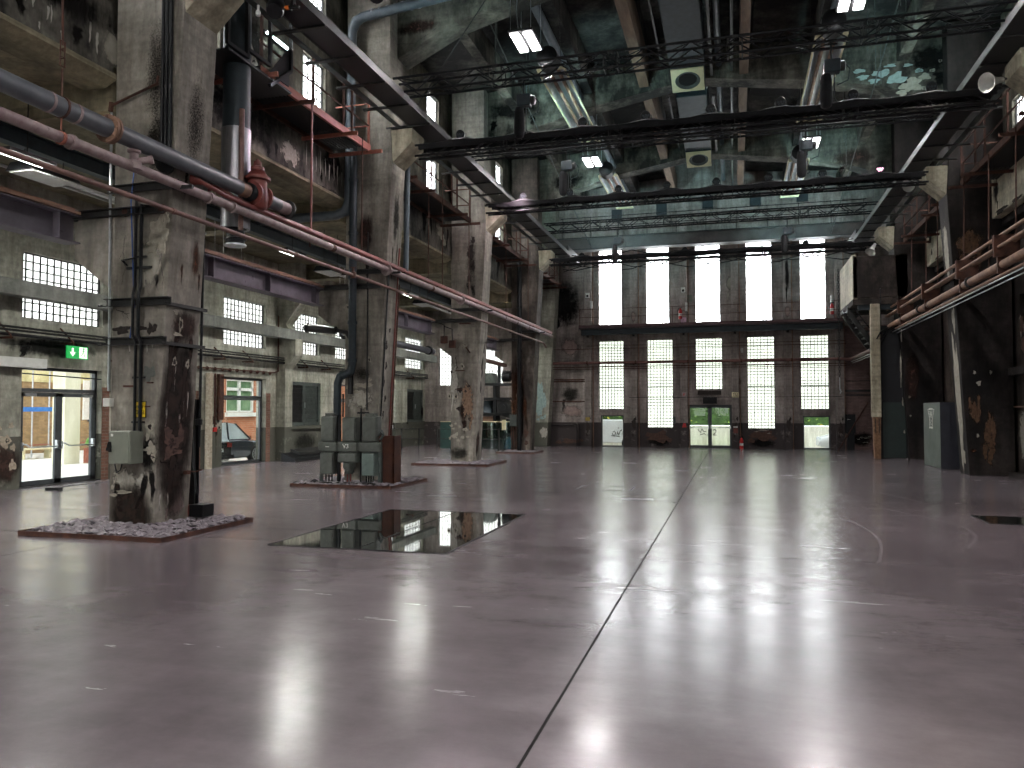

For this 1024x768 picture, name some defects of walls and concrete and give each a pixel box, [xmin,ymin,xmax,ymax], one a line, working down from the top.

water stain [148,29,161,142]
spalling [853,59,942,96]
water stain [188,88,203,158]
spalling [112,322,157,335]
spalling [447,344,485,442]
spalling [0,422,16,471]
spalling [143,421,184,462]